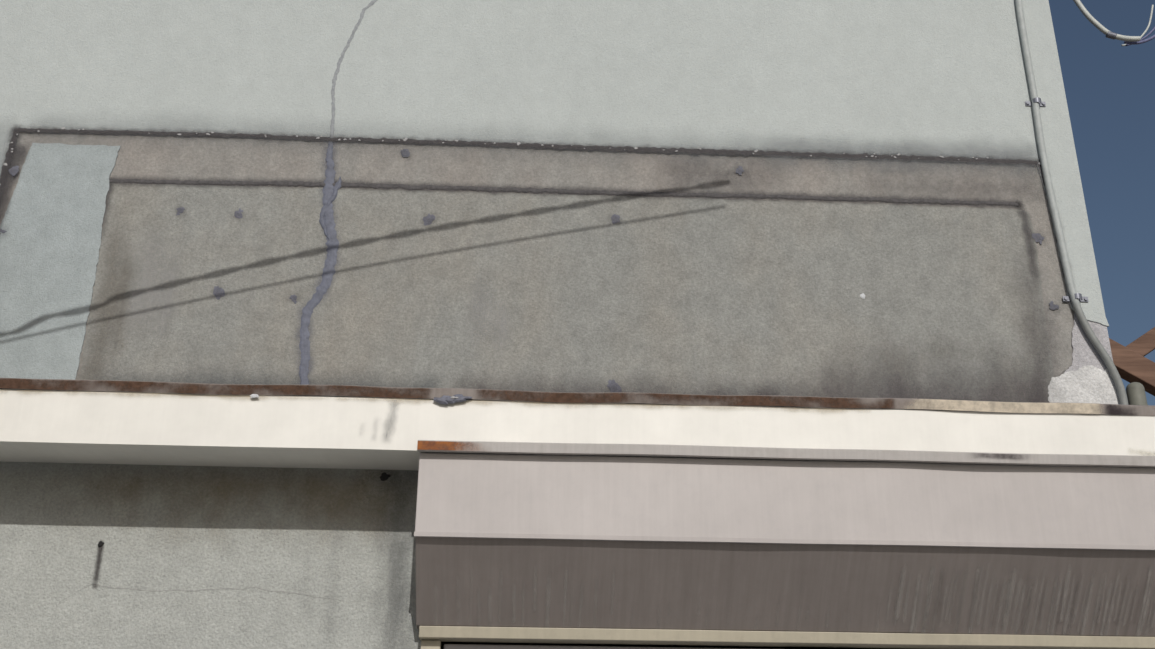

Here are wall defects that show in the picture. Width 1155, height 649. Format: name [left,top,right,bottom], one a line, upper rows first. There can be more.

crack [105,0,1034,385]
corrosion [0,378,429,398]
corrosion [480,389,628,403]
corrosion [644,393,893,408]
corrosion [1107,404,1134,415]
corrosion [417,441,468,451]